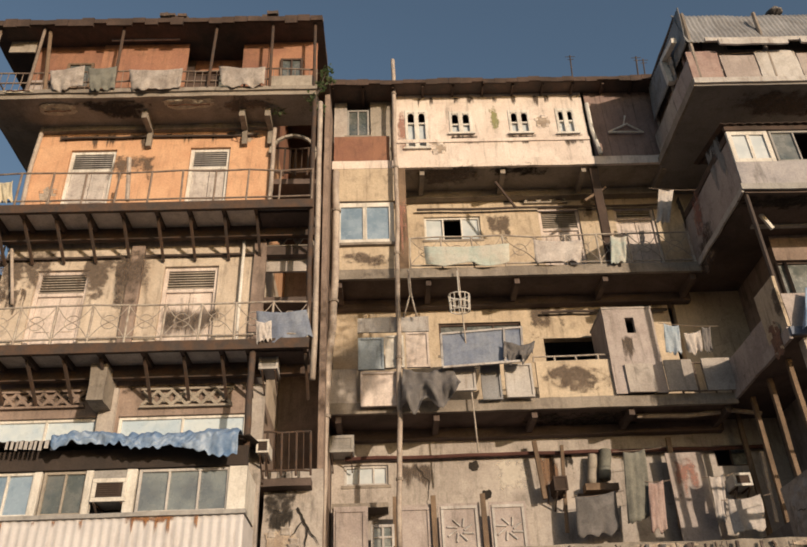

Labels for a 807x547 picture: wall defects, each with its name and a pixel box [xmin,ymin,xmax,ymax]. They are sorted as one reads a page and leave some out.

damp [75,100,144,119]
damp [487,216,511,235]
damp [345,252,384,266]
damp [0,252,56,315]
damp [78,251,151,304]
damp [545,365,604,393]
damp [265,490,297,529]
corrosion [126,516,173,533]
crack [290,507,319,547]